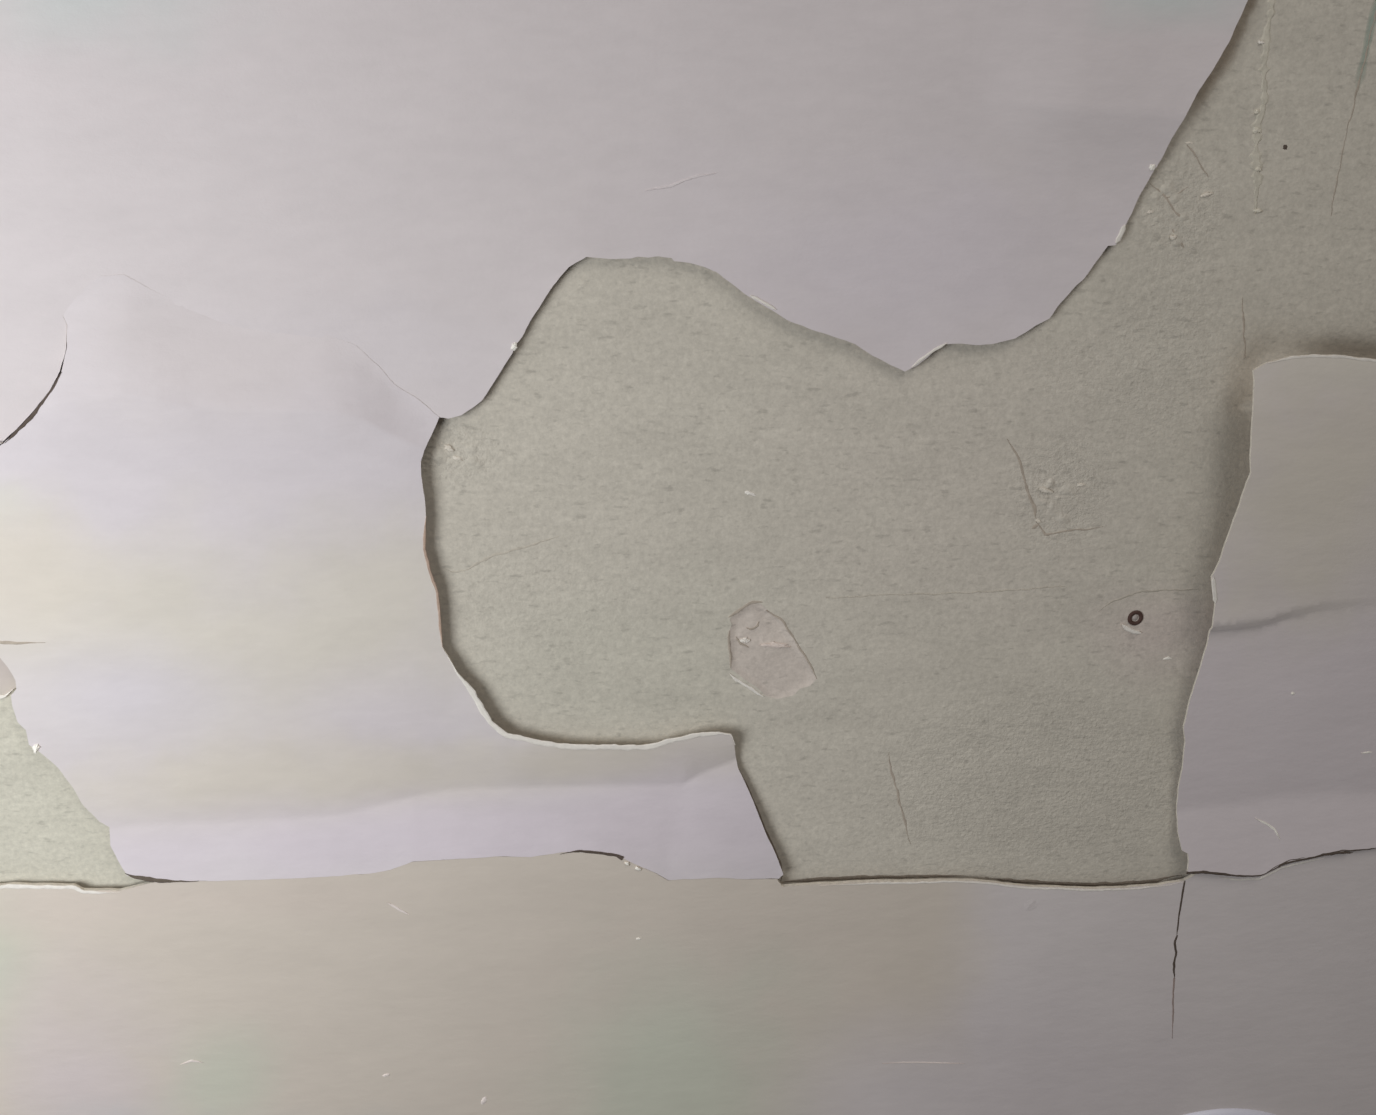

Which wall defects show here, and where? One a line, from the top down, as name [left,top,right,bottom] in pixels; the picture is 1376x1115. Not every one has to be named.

peeling [421,0,1376,891]
peeling [0,658,148,894]
crack [1172,848,1376,1036]